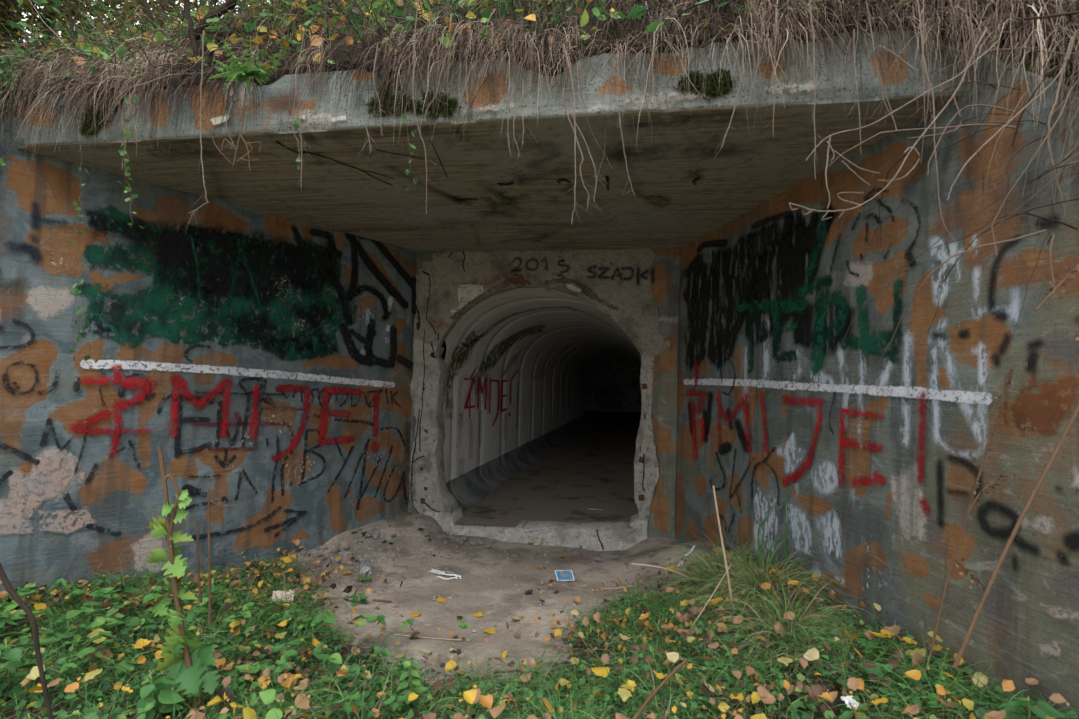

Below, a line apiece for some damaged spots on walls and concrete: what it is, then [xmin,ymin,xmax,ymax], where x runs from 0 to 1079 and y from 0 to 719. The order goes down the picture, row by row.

crack [277,142,448,186]
spalling [409,248,671,551]